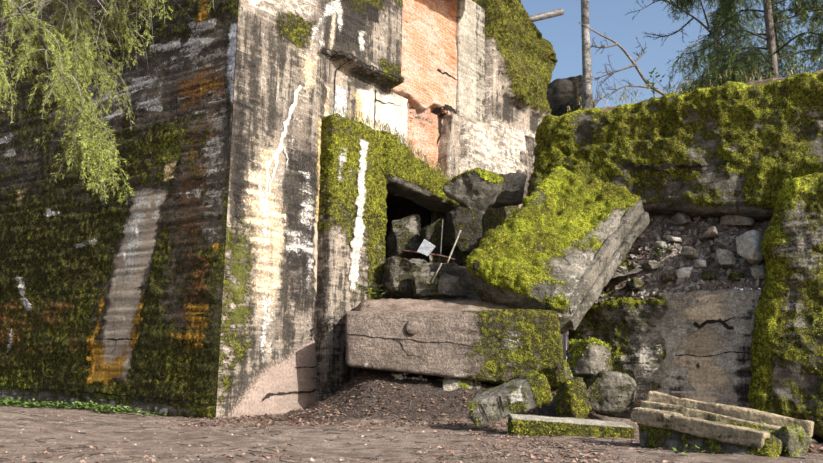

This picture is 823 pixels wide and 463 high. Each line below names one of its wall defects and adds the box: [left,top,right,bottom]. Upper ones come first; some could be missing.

leakage [300,0,367,90]
leakage [227,23,363,360]
leakage [349,140,369,289]
crack [693,317,734,329]
crack [348,334,485,361]
crack [675,350,751,358]
crack [262,366,317,401]